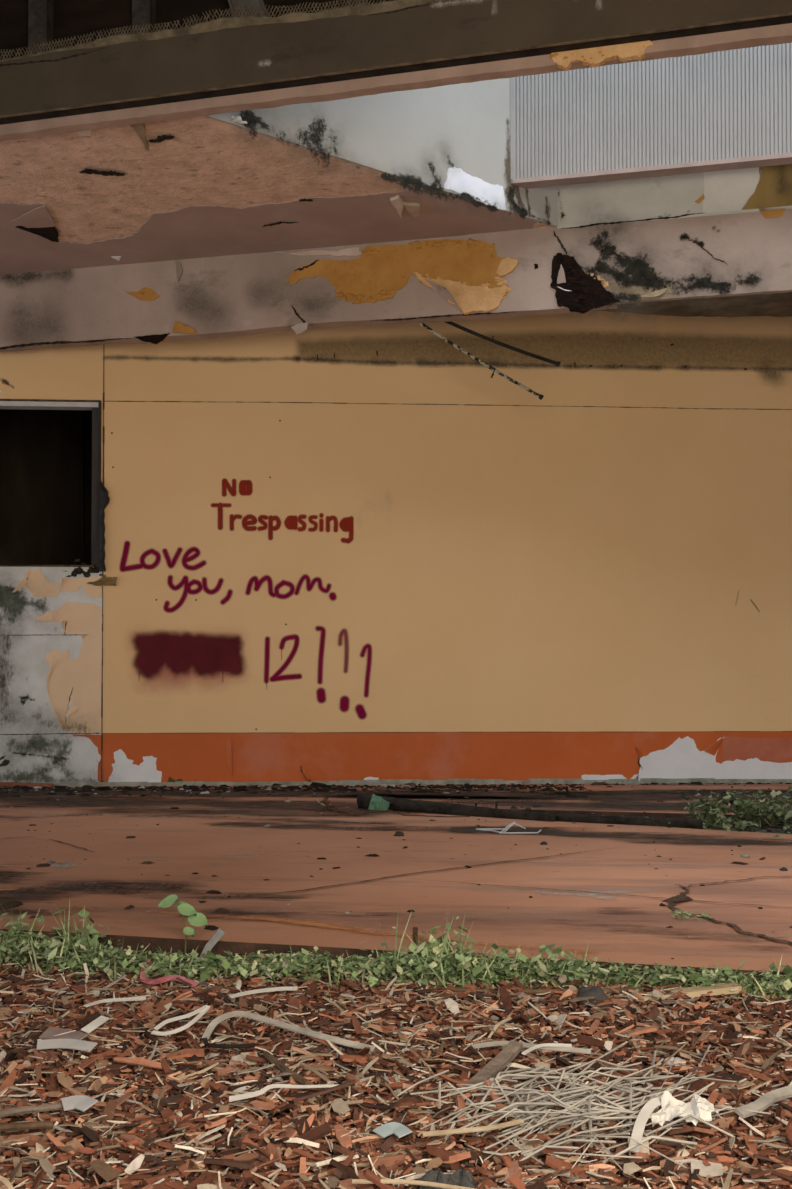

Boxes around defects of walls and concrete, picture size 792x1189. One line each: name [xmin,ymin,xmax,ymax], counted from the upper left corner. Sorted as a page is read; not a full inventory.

peeling [0,167,537,315]
spalling [550,231,674,314]
damp [579,230,761,307]
damp [301,335,792,379]
damp [0,586,46,622]
damp [0,636,12,701]
peeling [13,569,162,782]
damp [0,715,792,845]
peeling [581,736,792,781]
crack [229,847,792,944]